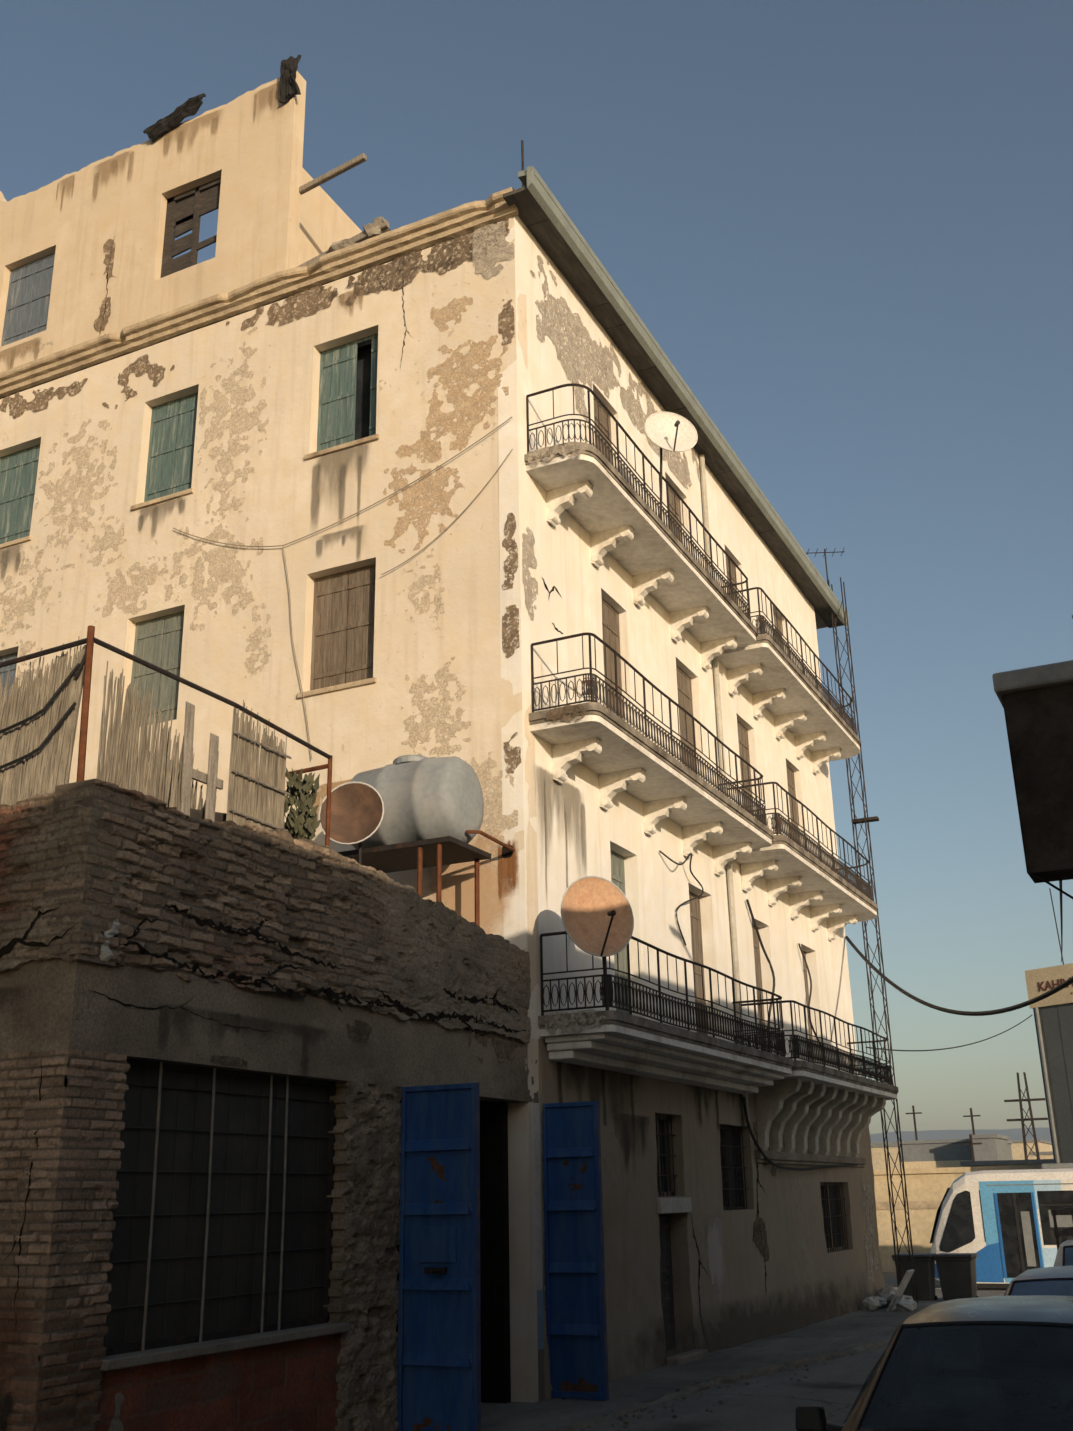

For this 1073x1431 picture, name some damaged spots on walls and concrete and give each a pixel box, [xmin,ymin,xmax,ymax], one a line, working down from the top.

damp [56,175,74,208]
damp [93,152,133,198]
damp [161,111,218,153]
damp [254,82,281,117]
spalling [528,255,701,489]
peeling [0,218,515,684]
spalling [502,513,538,658]
peeling [401,656,521,857]
crack [0,904,526,1038]
crack [5,1063,42,1338]